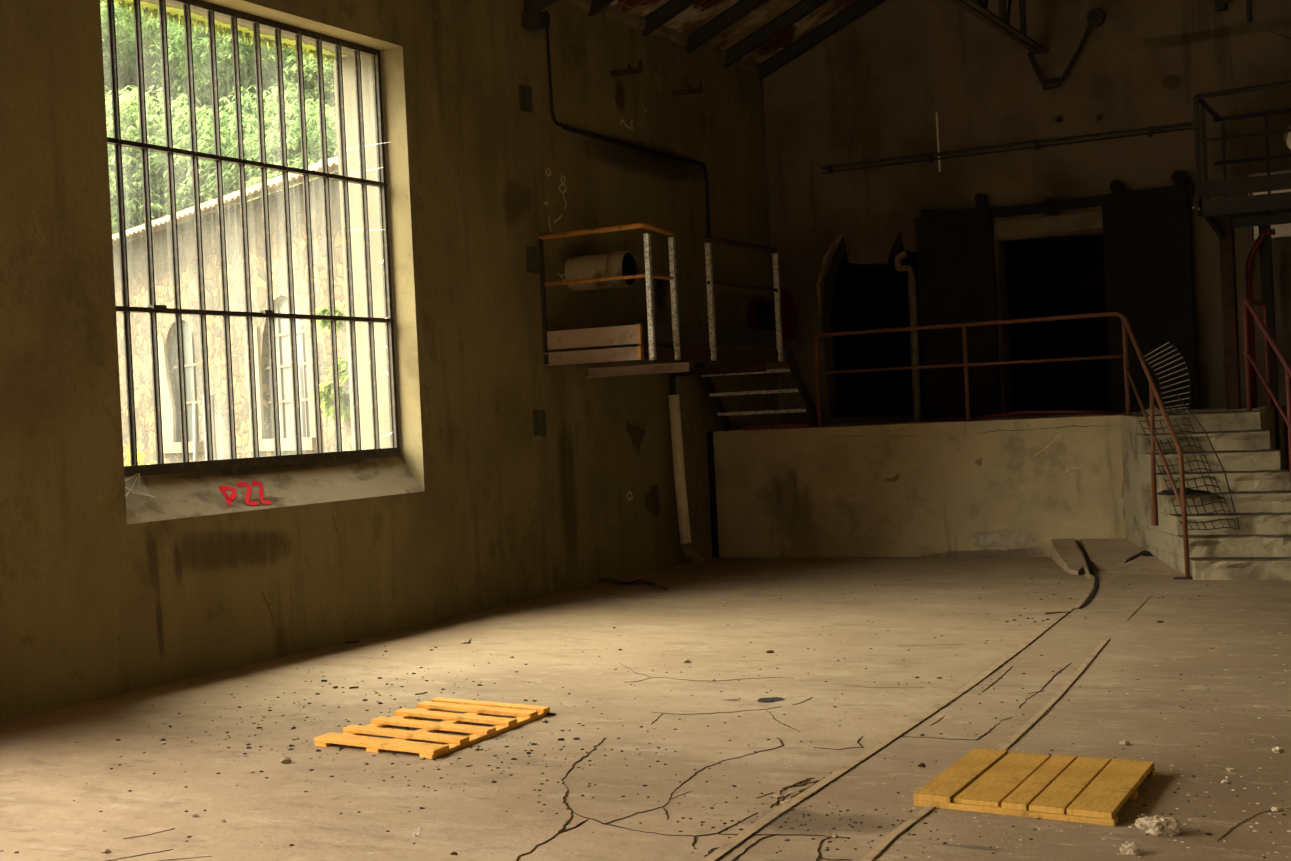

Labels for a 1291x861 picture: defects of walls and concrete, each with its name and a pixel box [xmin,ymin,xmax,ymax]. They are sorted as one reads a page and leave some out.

crack [516,663,864,861]
crack [916,663,1071,740]